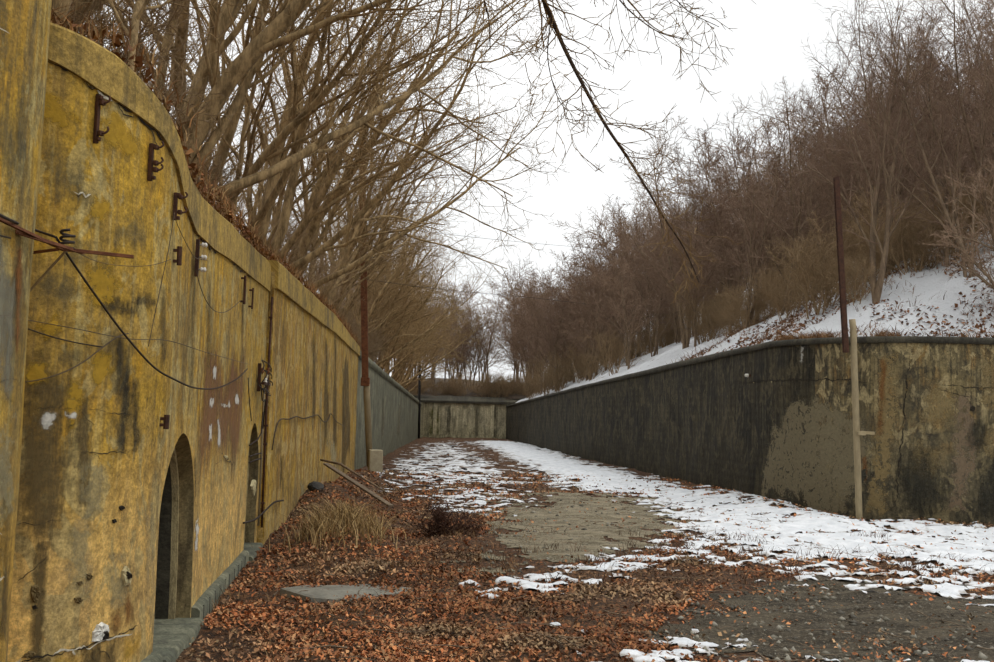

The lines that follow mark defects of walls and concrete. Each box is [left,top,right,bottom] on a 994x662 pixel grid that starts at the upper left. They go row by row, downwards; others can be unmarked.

peeling [85,250,125,306]
peeling [26,363,48,384]
peeling [42,412,55,429]
peeling [66,381,83,428]
damp [897,396,994,518]
damp [1,564,9,635]
spalling [92,622,110,642]